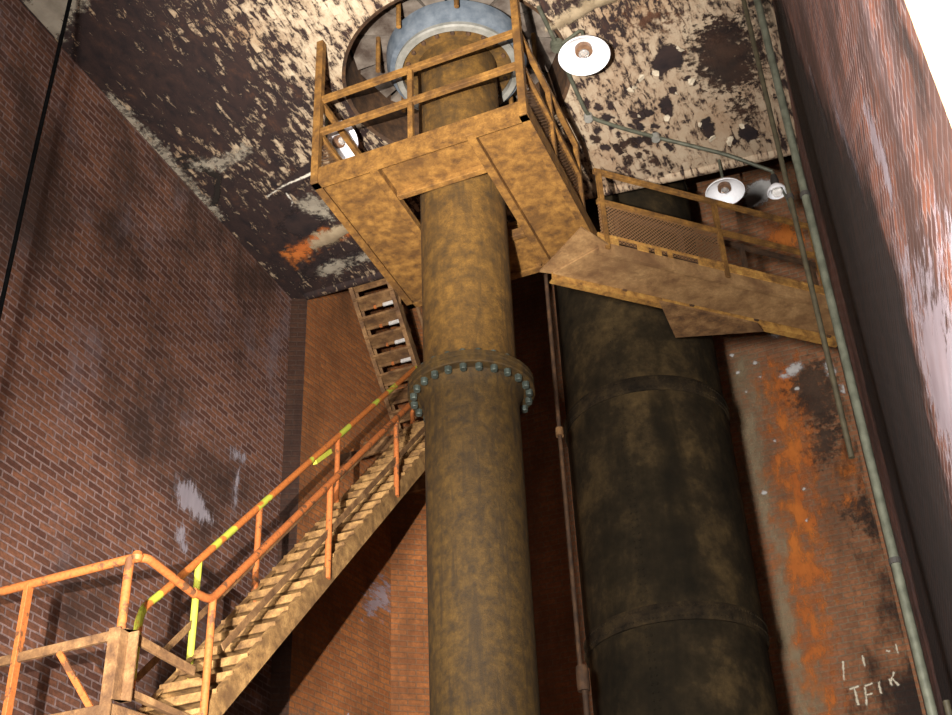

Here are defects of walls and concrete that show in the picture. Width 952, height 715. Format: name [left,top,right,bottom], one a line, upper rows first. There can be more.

peeling [590,6,769,178]
peeling [270,163,311,197]
peeling [276,209,326,242]
rust [281,228,326,262]
peeling [300,247,366,280]
water stain [774,0,952,715]
water stain [731,406,770,523]
water stain [177,480,214,522]
water stain [176,524,187,552]